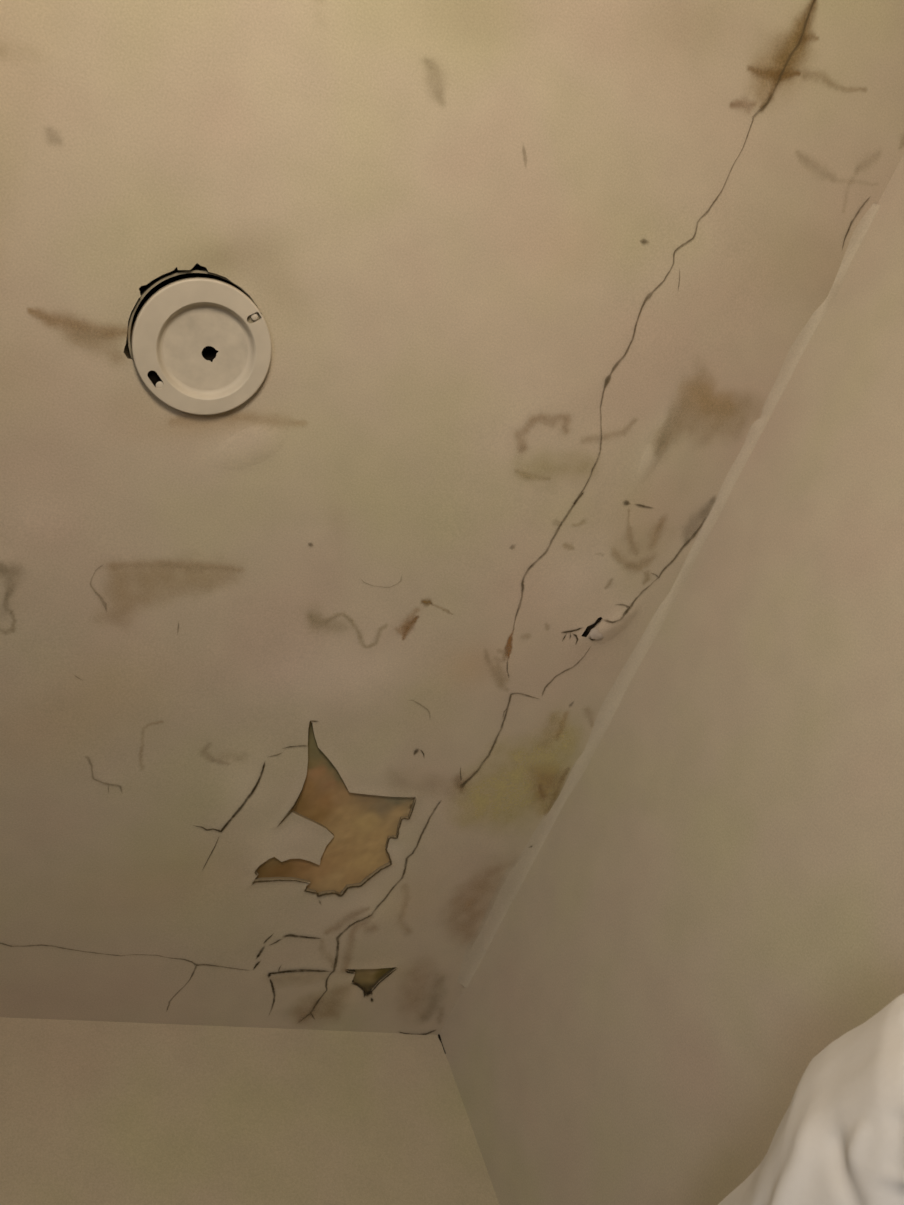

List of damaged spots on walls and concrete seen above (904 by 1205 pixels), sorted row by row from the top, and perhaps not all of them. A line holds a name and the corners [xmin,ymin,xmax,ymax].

crack [601,0,815,403]
crack [513,436,602,628]
crack [606,524,702,623]
crack [0,648,590,1021]
peeling [252,721,416,897]
peeling [346,967,397,1002]